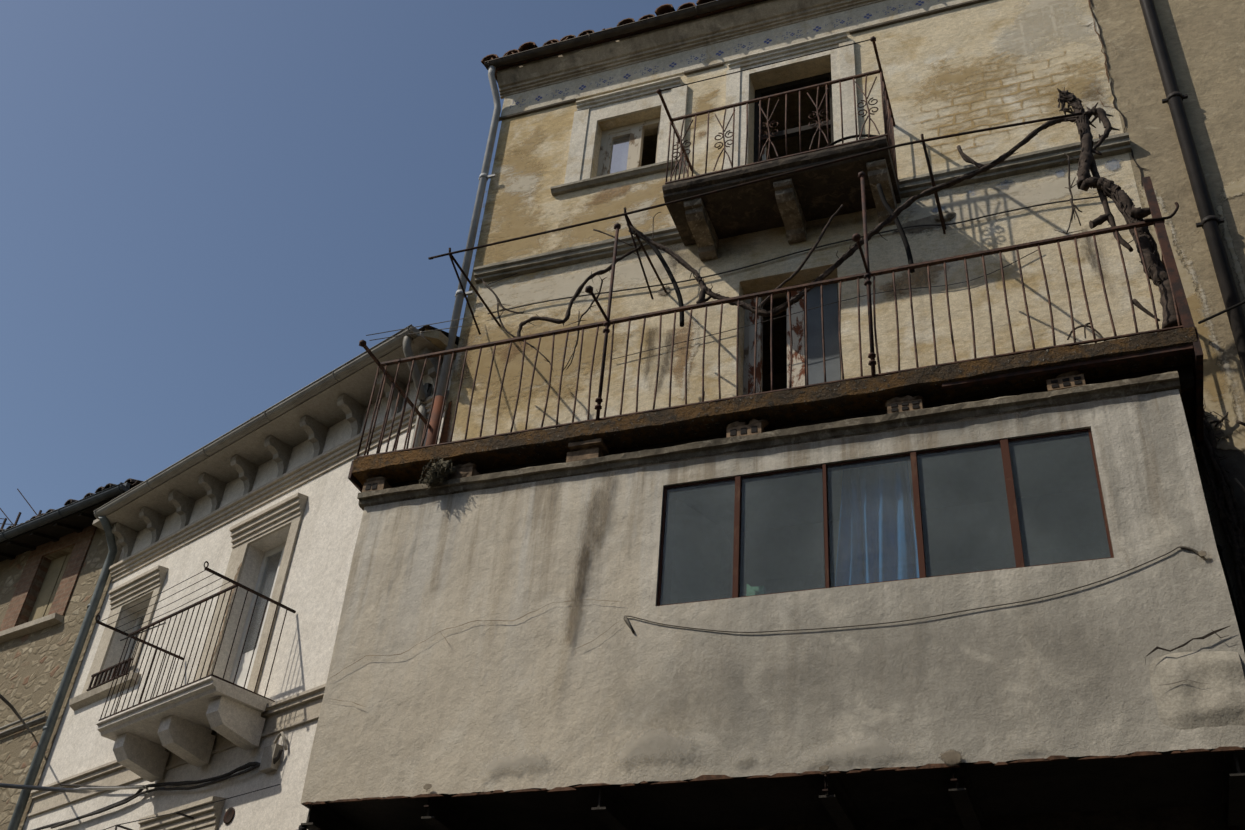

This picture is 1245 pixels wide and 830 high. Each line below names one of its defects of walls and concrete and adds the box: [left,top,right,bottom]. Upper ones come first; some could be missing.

peeling [917,0,1115,154]
flaking render [894,167,1245,452]
crack [1145,626,1230,686]